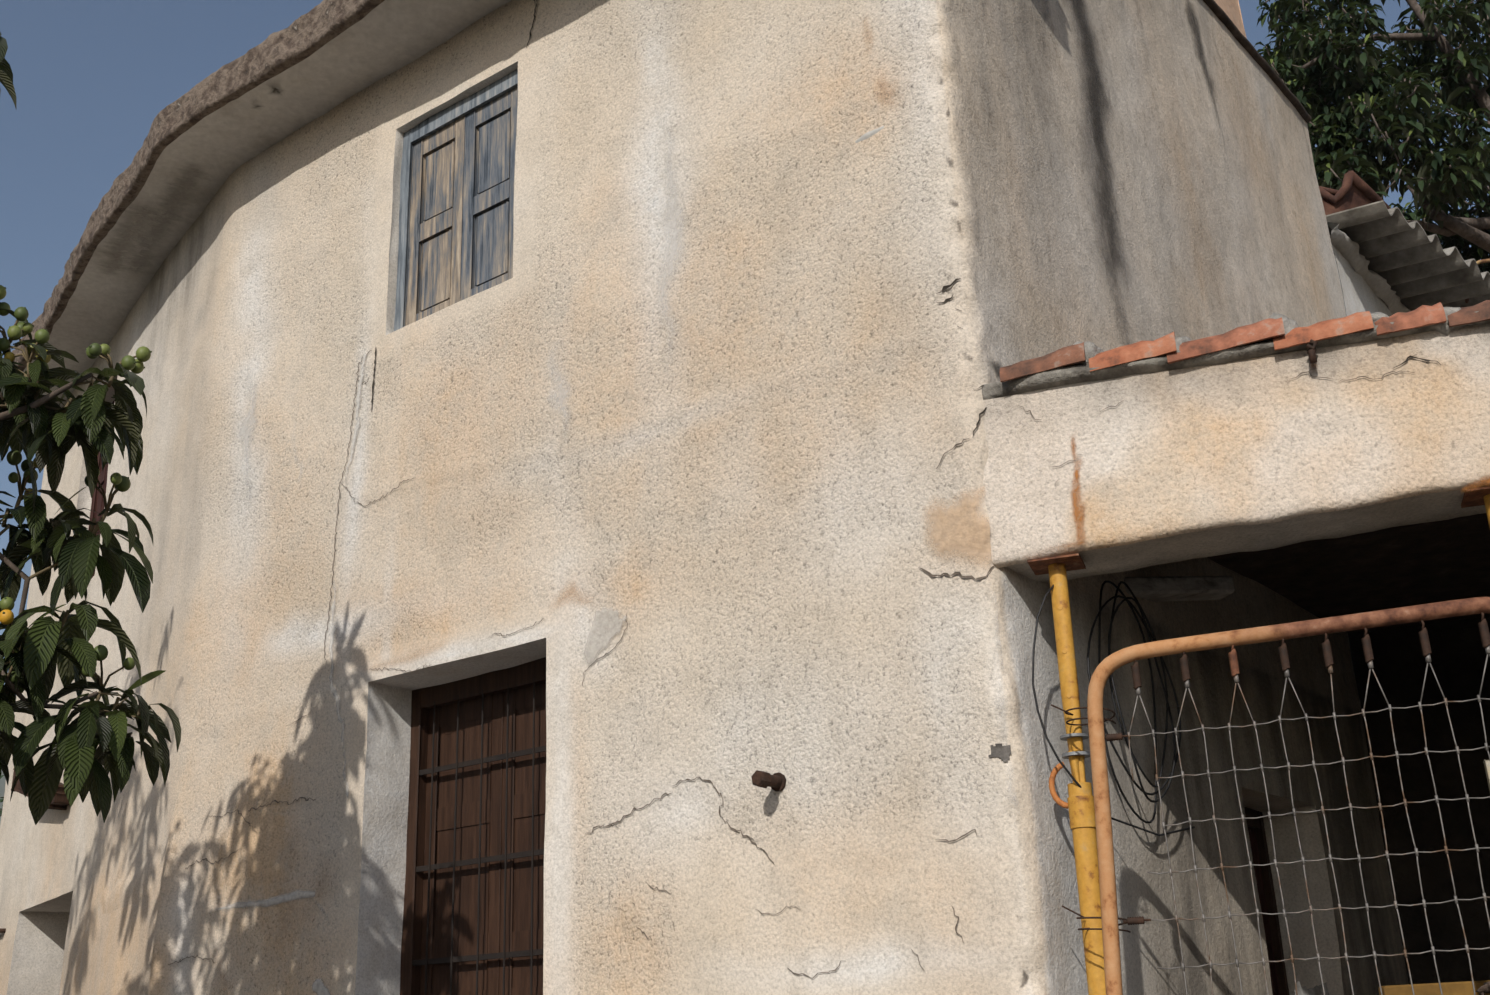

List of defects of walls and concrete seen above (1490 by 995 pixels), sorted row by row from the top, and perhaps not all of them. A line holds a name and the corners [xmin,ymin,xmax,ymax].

crack [526,0,537,49]
leakage [1187,0,1215,103]
leakage [1069,0,1116,260]
crack [1287,354,1441,384]
crack [936,385,1042,469]
crack [324,348,414,663]
flaking render [931,495,991,558]
corrosion [1072,443,1084,544]
crack [185,797,316,869]
crack [585,777,774,864]
crack [788,960,844,979]